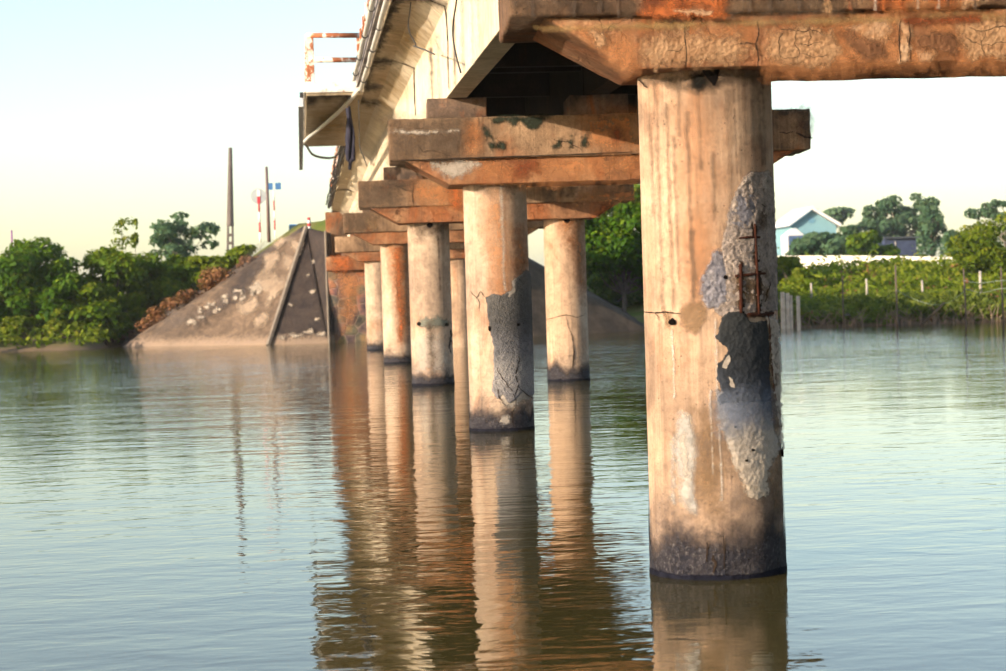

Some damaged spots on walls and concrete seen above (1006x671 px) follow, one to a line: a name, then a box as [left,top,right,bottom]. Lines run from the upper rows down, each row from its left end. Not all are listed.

rust [643,0,726,18]
crack [736,21,824,67]
leakage [735,0,839,24]
leakage [898,14,983,63]
crack [967,20,1006,53]
rust [413,109,637,207]
rust [331,256,354,328]
rust [388,245,410,339]
spalling [700,170,785,457]
crack [546,314,585,366]
leakage [648,517,787,581]